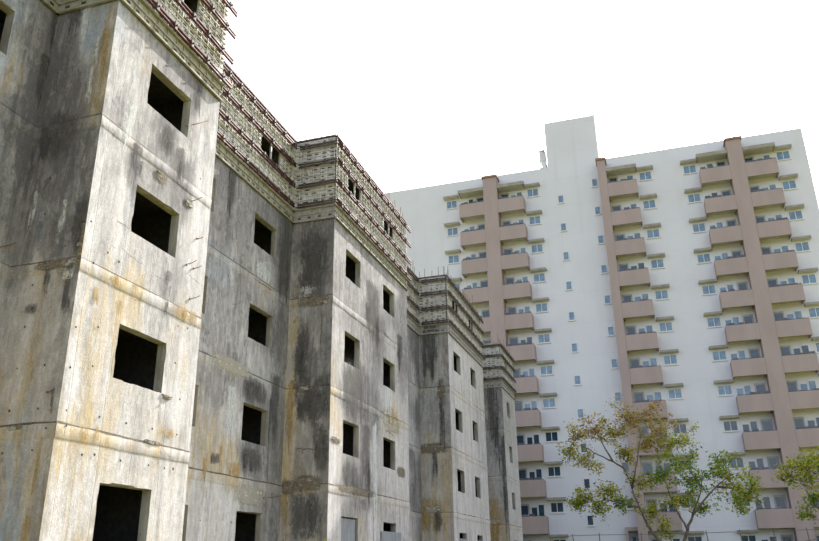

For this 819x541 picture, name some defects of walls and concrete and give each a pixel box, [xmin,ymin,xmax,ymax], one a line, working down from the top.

leakage [69,8,90,50]
spalling [37,222,85,280]
leakage [58,199,87,253]
leakage [61,263,73,311]
leakage [422,325,443,387]
leakage [294,326,330,469]
leakage [343,363,391,541]
leakage [432,397,445,474]
spalling [281,476,320,494]
leakage [292,495,320,537]